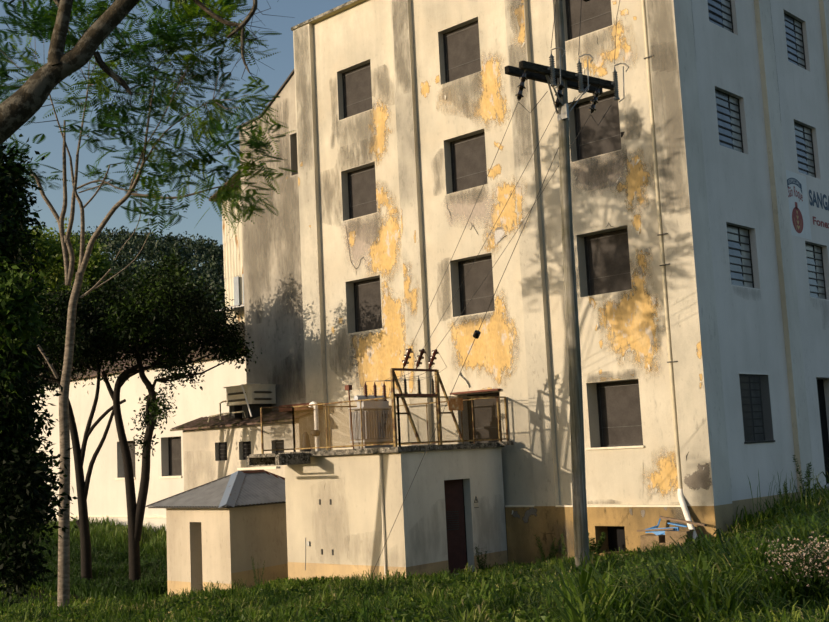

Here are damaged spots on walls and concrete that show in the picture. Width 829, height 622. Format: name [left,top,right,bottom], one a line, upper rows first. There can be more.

damp [377,65,389,97]
damp [393,4,407,87]
peeling [462,55,507,126]
damp [510,51,527,122]
peeling [581,1,637,76]
damp [652,0,684,204]
damp [245,108,298,320]
peeling [450,164,525,251]
peeling [352,187,417,397]
peeling [450,296,517,393]
peeling [589,250,658,371]
peeling [648,452,711,494]